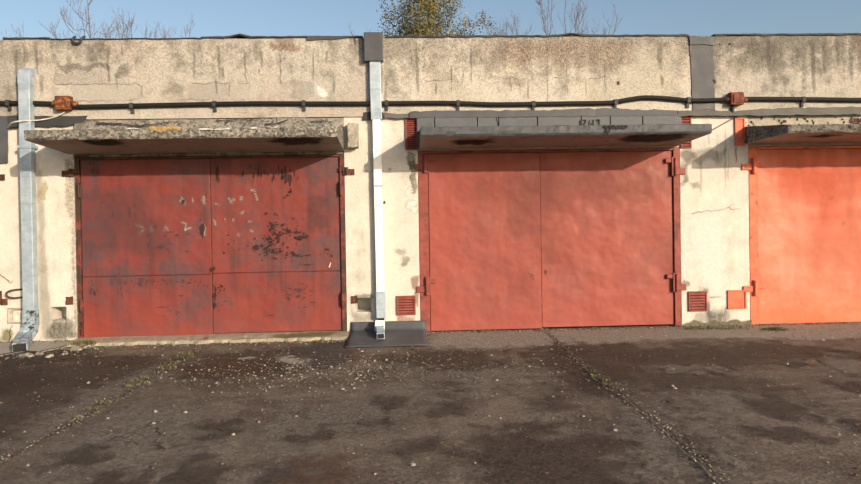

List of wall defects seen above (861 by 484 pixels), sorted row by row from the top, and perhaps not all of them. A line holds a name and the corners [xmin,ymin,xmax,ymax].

peeling [242,164,299,198]
peeling [223,212,333,265]